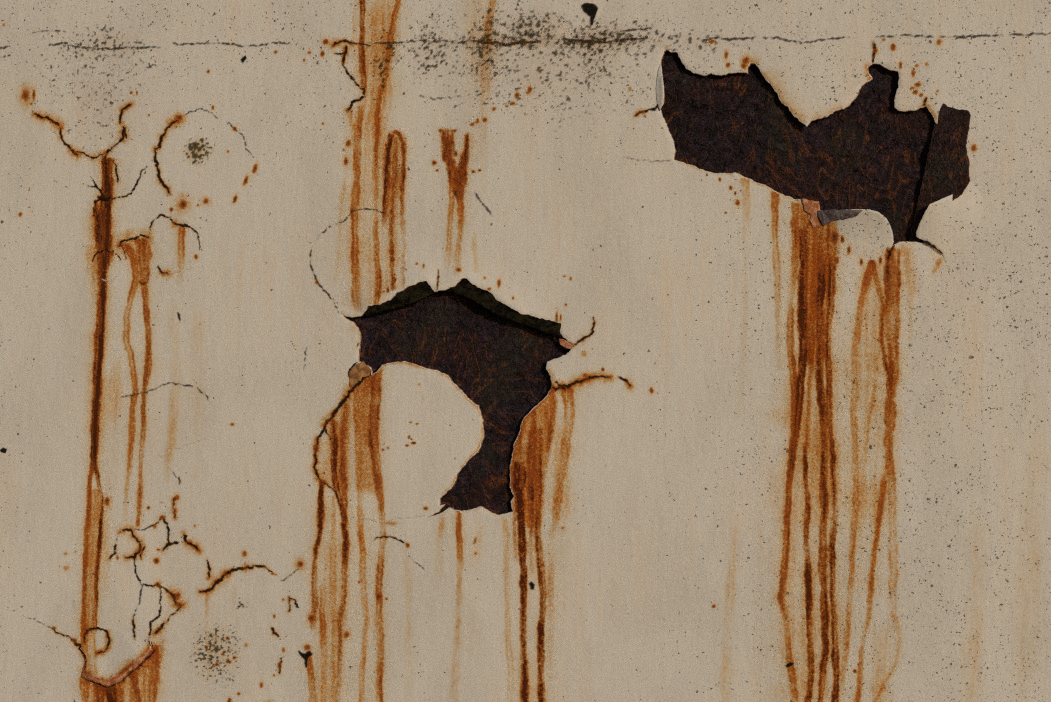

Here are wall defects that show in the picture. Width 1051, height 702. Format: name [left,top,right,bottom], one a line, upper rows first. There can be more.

corrosion [81,158,113,637]
crack [22,90,257,285]
crack [126,382,208,398]
crack [30,477,314,702]
corrosion [314,406,362,565]
crack [310,208,389,308]
peeling [346,279,575,515]
corrosion [511,388,573,702]
crack [574,317,595,345]
peeling [656,51,971,245]
corrosion [778,214,850,702]
corrosion [861,248,901,461]